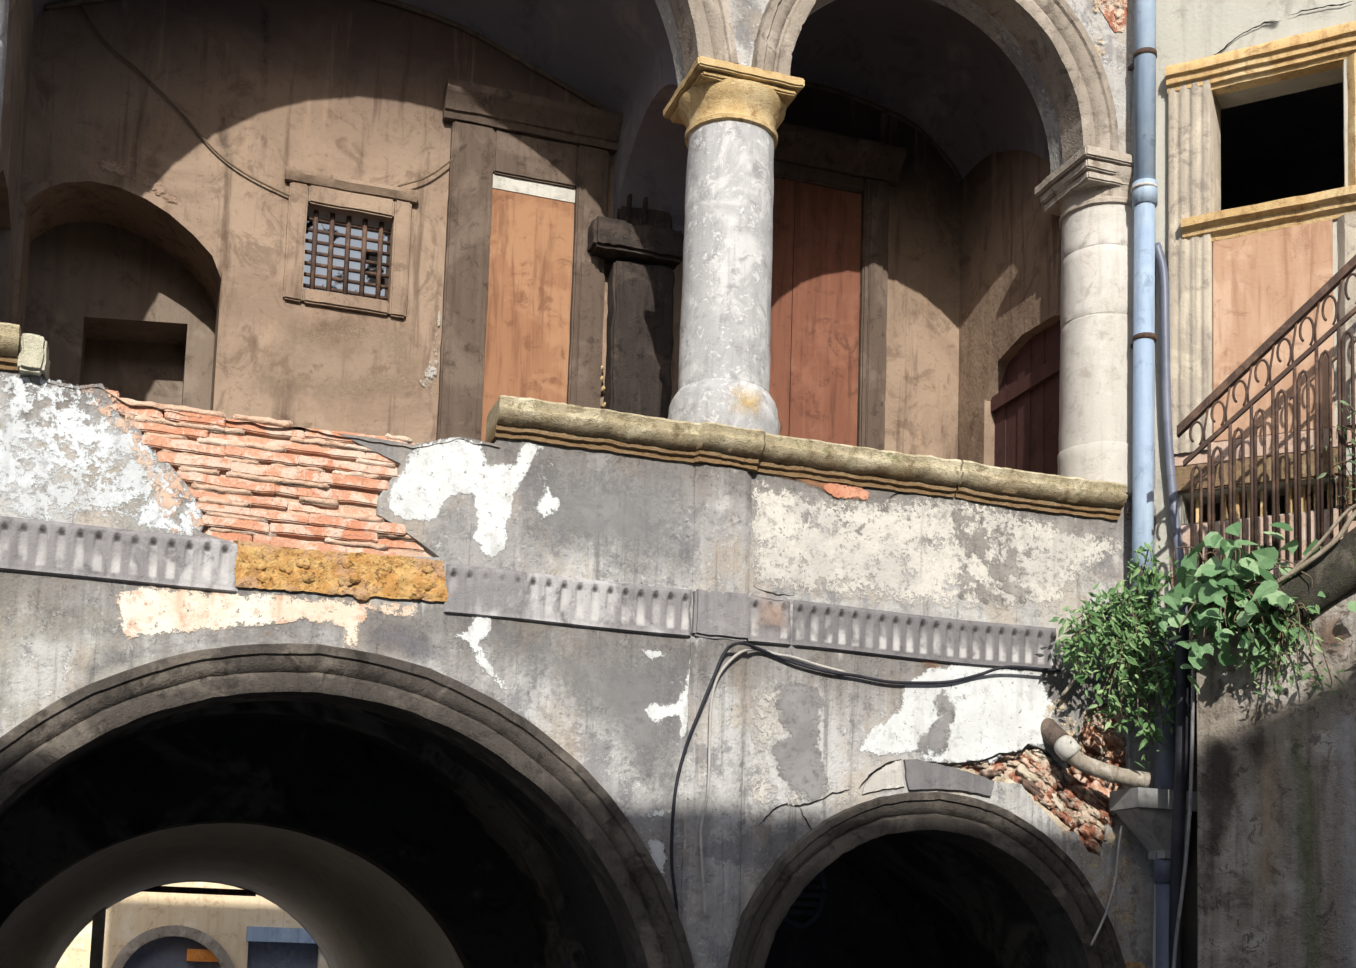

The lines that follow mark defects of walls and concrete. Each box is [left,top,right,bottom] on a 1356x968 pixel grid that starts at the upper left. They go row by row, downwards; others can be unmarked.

spalling [1091,0,1129,55]
crack [1214,1,1353,55]
spalling [420,296,441,386]
flaking render [0,373,560,561]
peeling [117,585,419,649]
peeling [451,616,506,689]
crack [760,744,1052,830]
peeling [859,664,1126,855]